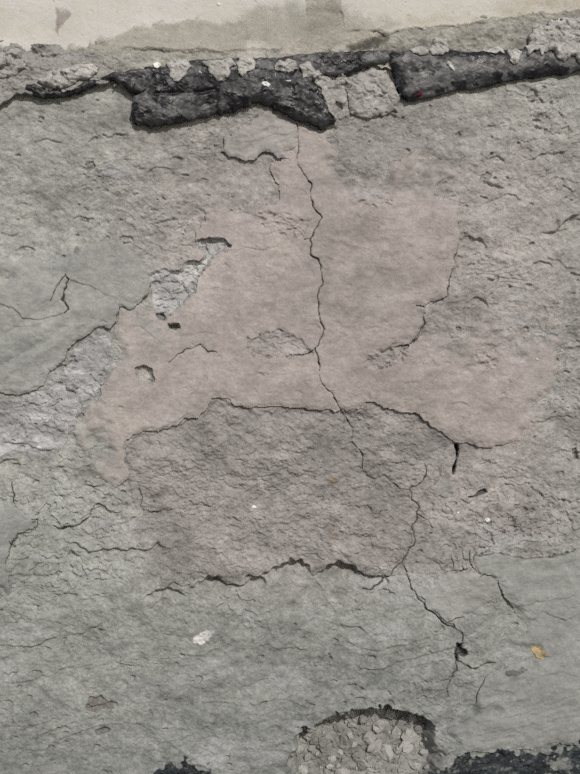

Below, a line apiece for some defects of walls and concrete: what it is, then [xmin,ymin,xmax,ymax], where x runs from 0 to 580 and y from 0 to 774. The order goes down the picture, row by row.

spalling [332,116,429,177]
crack [50,274,69,313]
spalling [149,239,230,320]
spalling [247,329,313,358]
crack [293,123,496,693]
spalling [125,400,458,581]